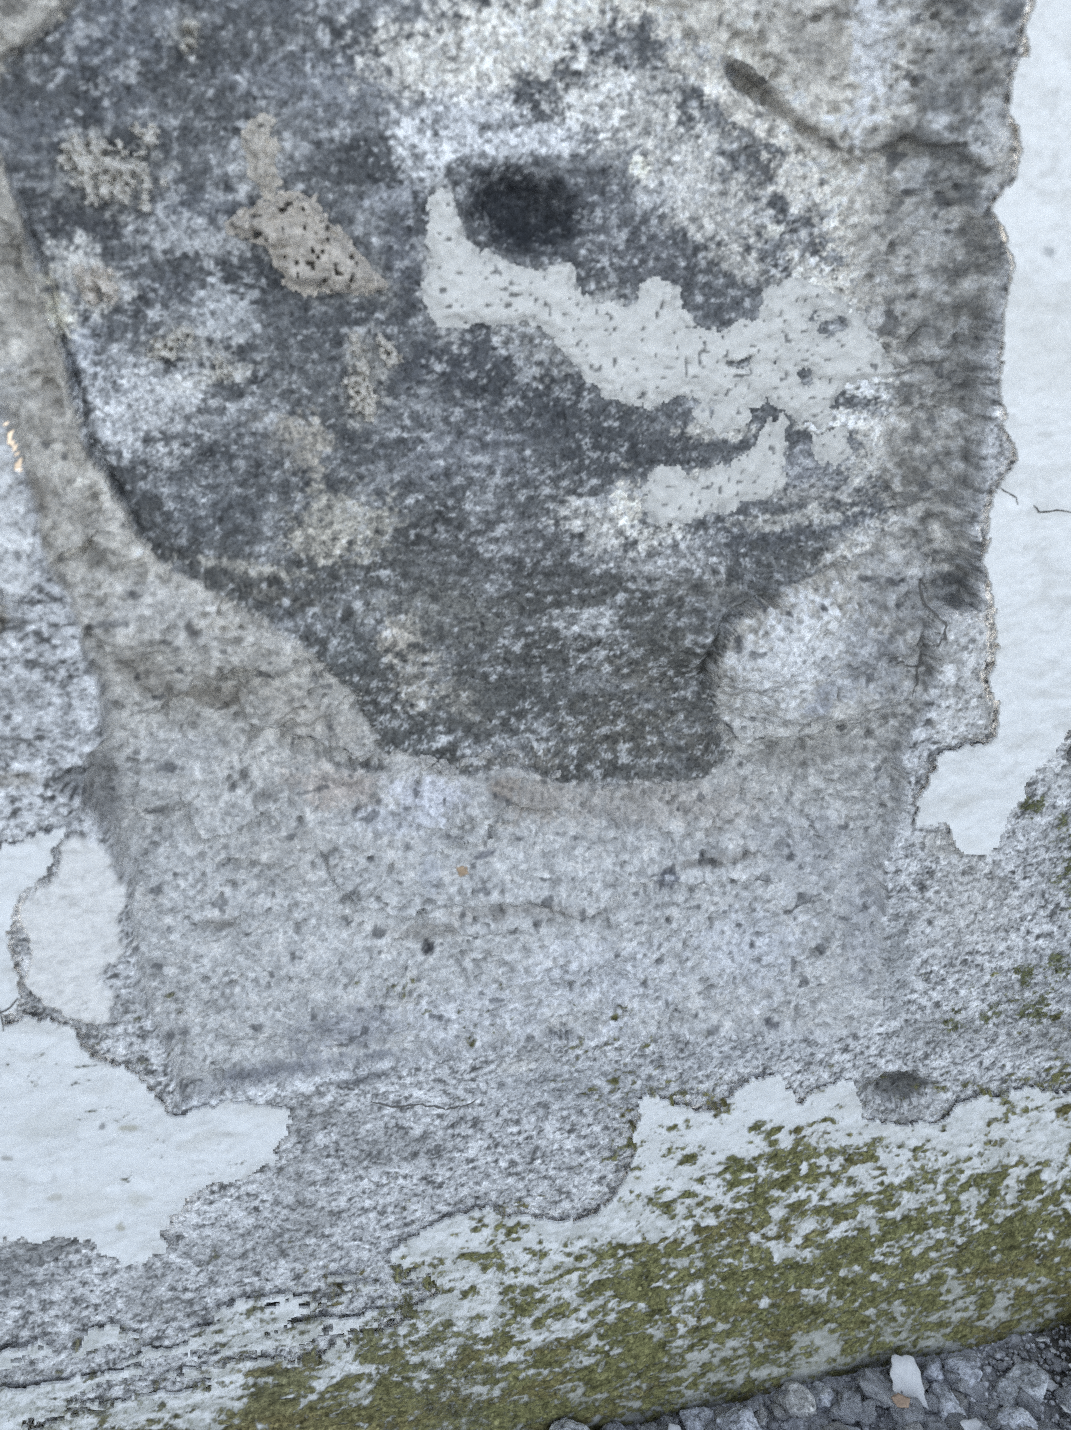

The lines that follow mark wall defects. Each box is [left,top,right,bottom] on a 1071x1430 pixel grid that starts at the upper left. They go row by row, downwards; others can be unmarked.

spalling [0,0,1071,1125]
peeling [0,1024,876,1415]
peeling [22,1416,65,1430]
leakage [70,1302,480,1430]
peeling [890,1354,929,1409]